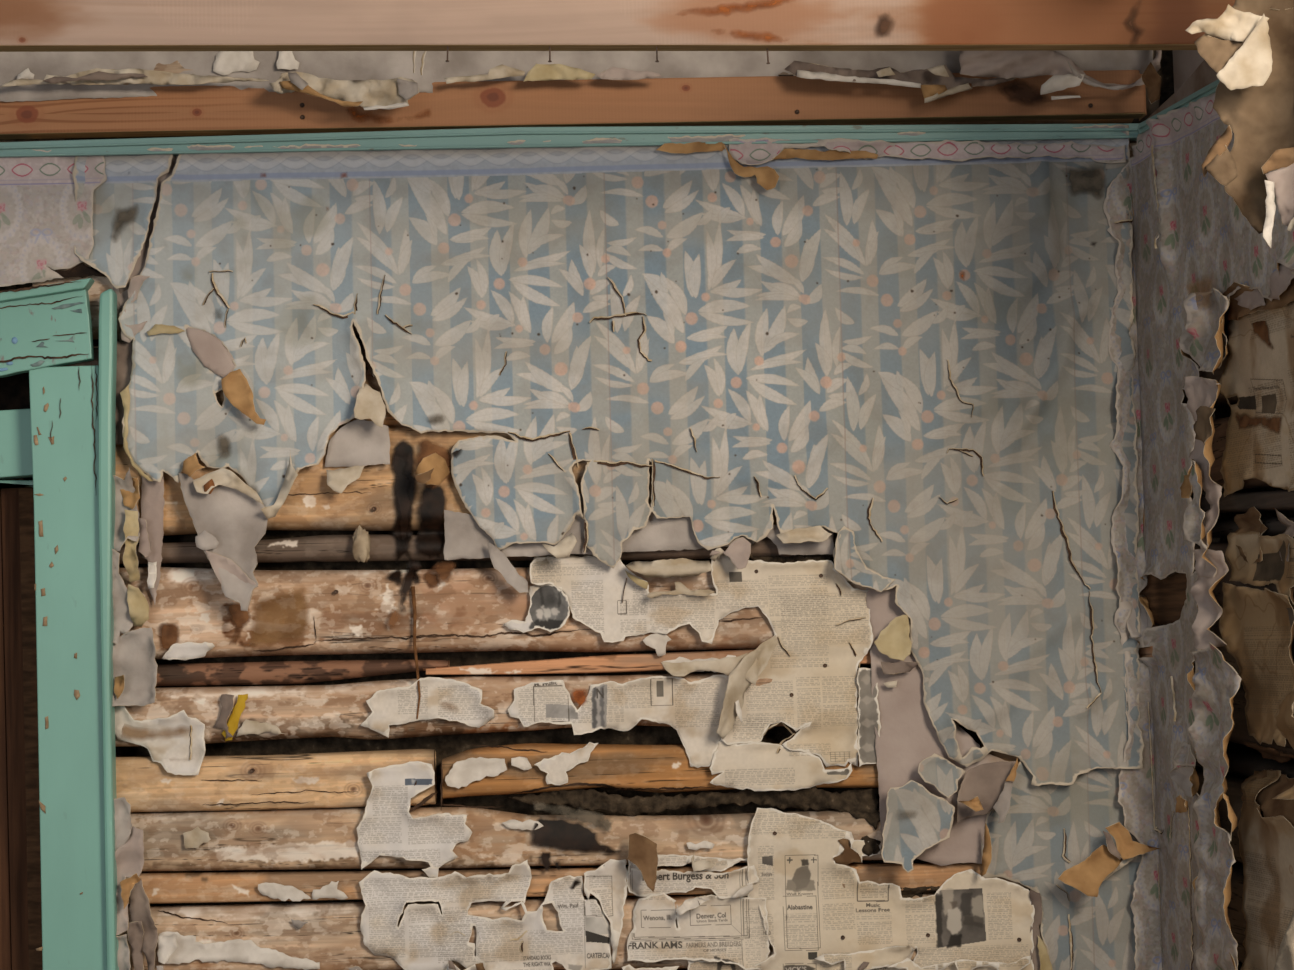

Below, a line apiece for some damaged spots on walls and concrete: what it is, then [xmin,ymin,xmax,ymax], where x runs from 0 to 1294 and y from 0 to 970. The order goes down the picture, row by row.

crack [589,277,652,362]
crack [499,351,507,375]
crack [508,427,720,507]
crack [754,476,762,497]
crack [794,475,828,500]
crack [946,448,984,476]
water stain [387,440,461,627]
crack [867,498,883,542]
peeling [1142,572,1194,625]
peeling [874,615,912,661]
peeling [833,838,862,865]
peeling [1029,889,1042,970]